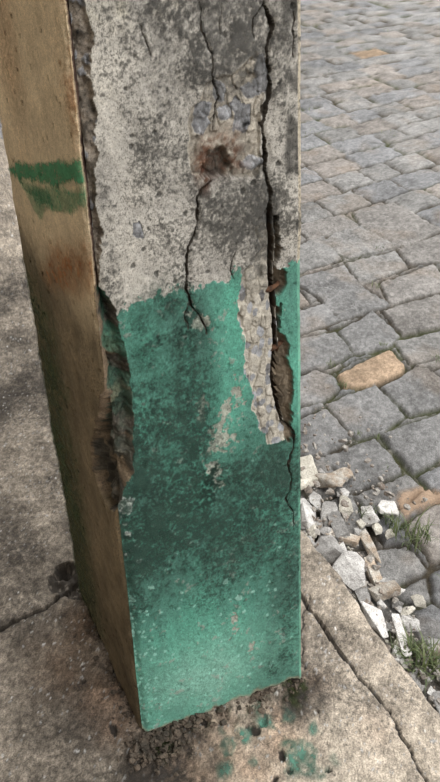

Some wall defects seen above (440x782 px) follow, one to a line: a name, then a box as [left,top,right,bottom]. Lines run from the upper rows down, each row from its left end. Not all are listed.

crack [197,0,223,129]
crack [251,0,296,210]
spalling [64,0,135,512]
crack [183,180,212,334]
spalling [195,206,295,490]
crack [285,423,296,525]